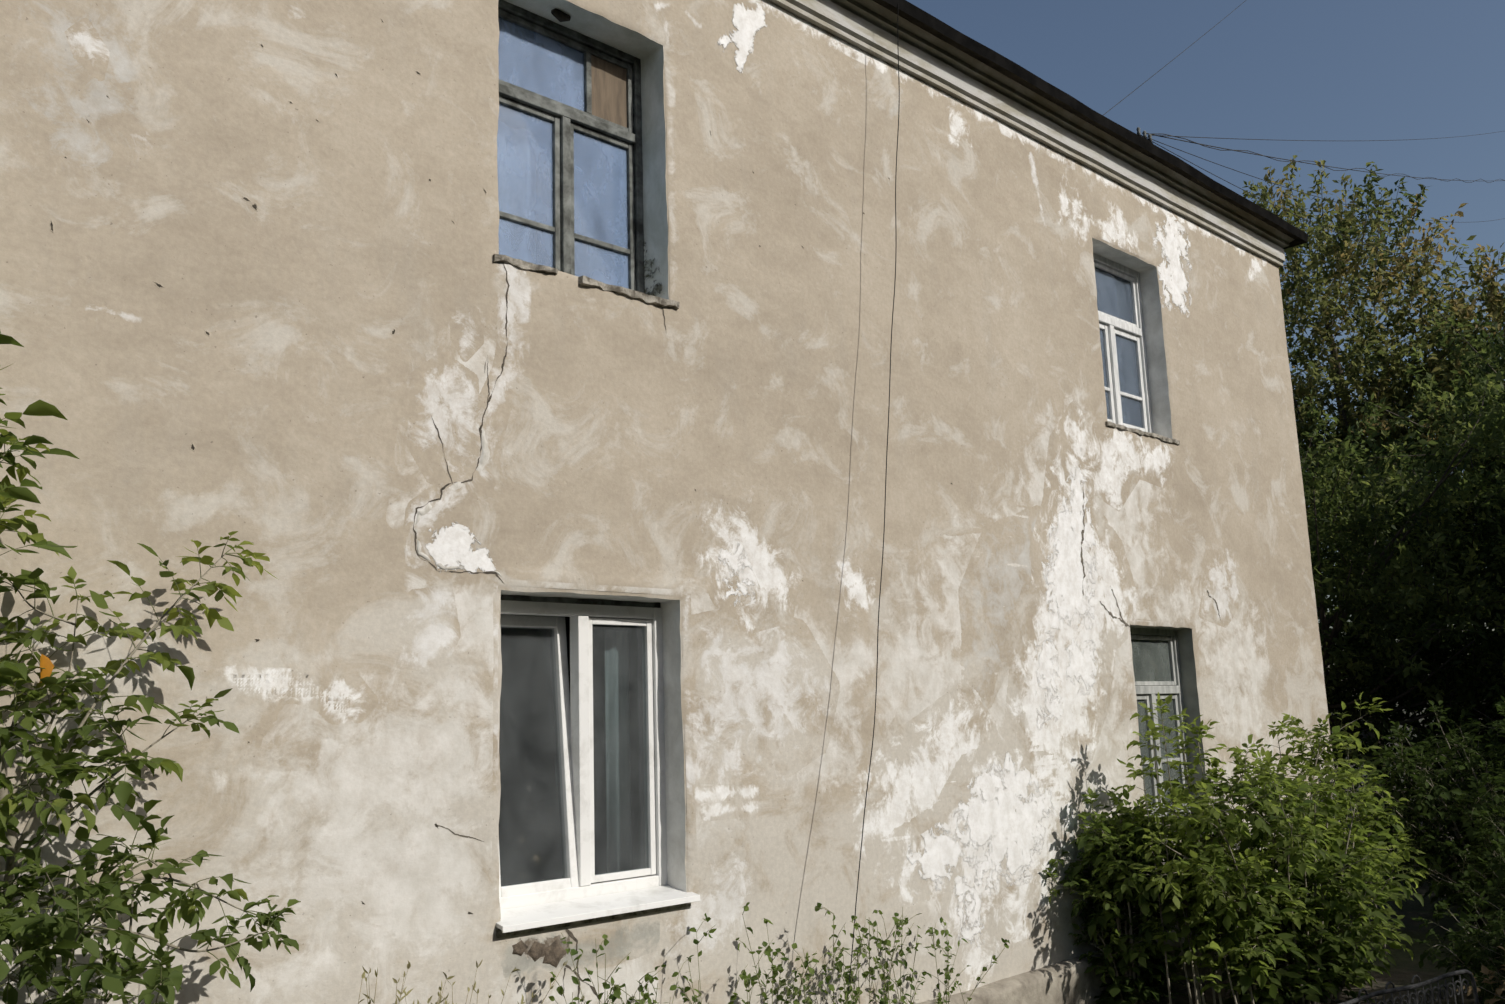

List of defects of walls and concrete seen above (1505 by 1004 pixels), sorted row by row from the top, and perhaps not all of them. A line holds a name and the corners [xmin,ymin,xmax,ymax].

flaking render [551,8,571,22]
peeling [717,0,1270,318]
peeling [396,521,505,674]
crack [401,249,531,582]
crack [1080,490,1130,627]
peeling [843,682,1086,992]